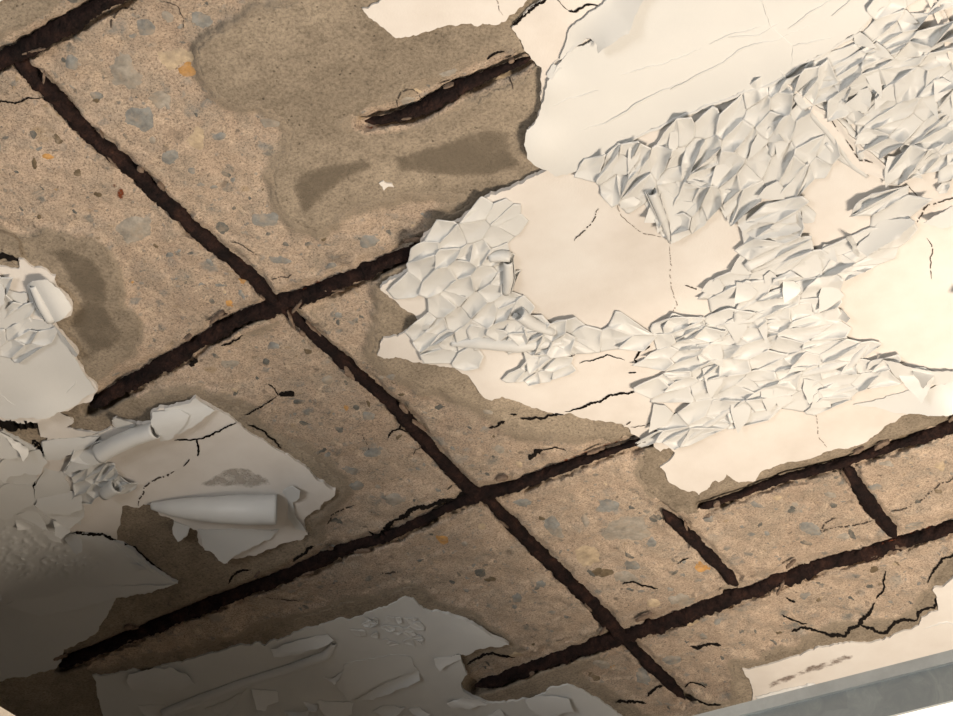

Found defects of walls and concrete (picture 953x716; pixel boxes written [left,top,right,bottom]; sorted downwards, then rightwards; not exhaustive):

crack [496,0,598,26]
damp [299,164,368,208]
damp [400,134,515,174]
peeling [0,0,953,495]
damp [60,253,113,349]
crack [489,346,650,429]
crack [0,420,44,454]
crack [138,384,294,504]
crack [369,484,471,539]
peeling [0,237,953,716]
crack [781,554,953,638]
crack [616,682,721,706]